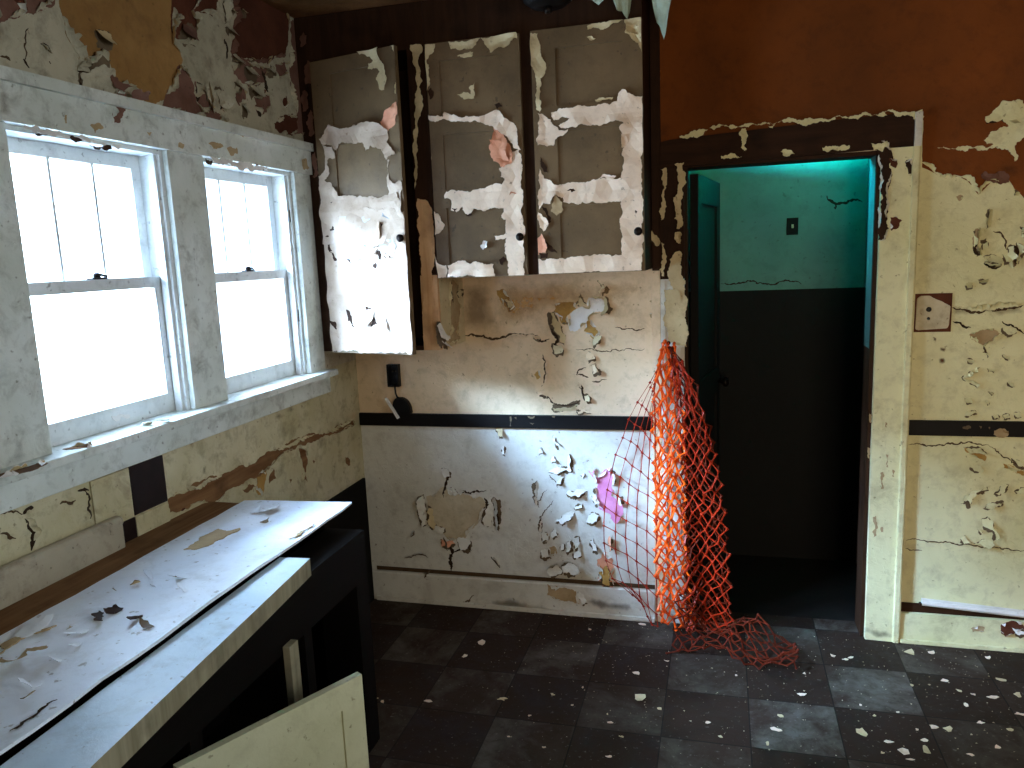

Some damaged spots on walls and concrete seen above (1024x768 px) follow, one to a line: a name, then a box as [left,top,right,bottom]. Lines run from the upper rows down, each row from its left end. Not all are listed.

peeling [0,0,304,151]
peeling [652,0,1024,241]
peeling [965,209,1024,290]
crack [952,301,1024,338]
crack [465,333,549,385]
peeling [537,280,613,418]
peeling [168,418,356,513]
crack [910,441,1024,476]
crack [1,506,42,551]
crack [60,487,92,519]
peeling [588,468,625,524]
crack [906,538,1024,552]